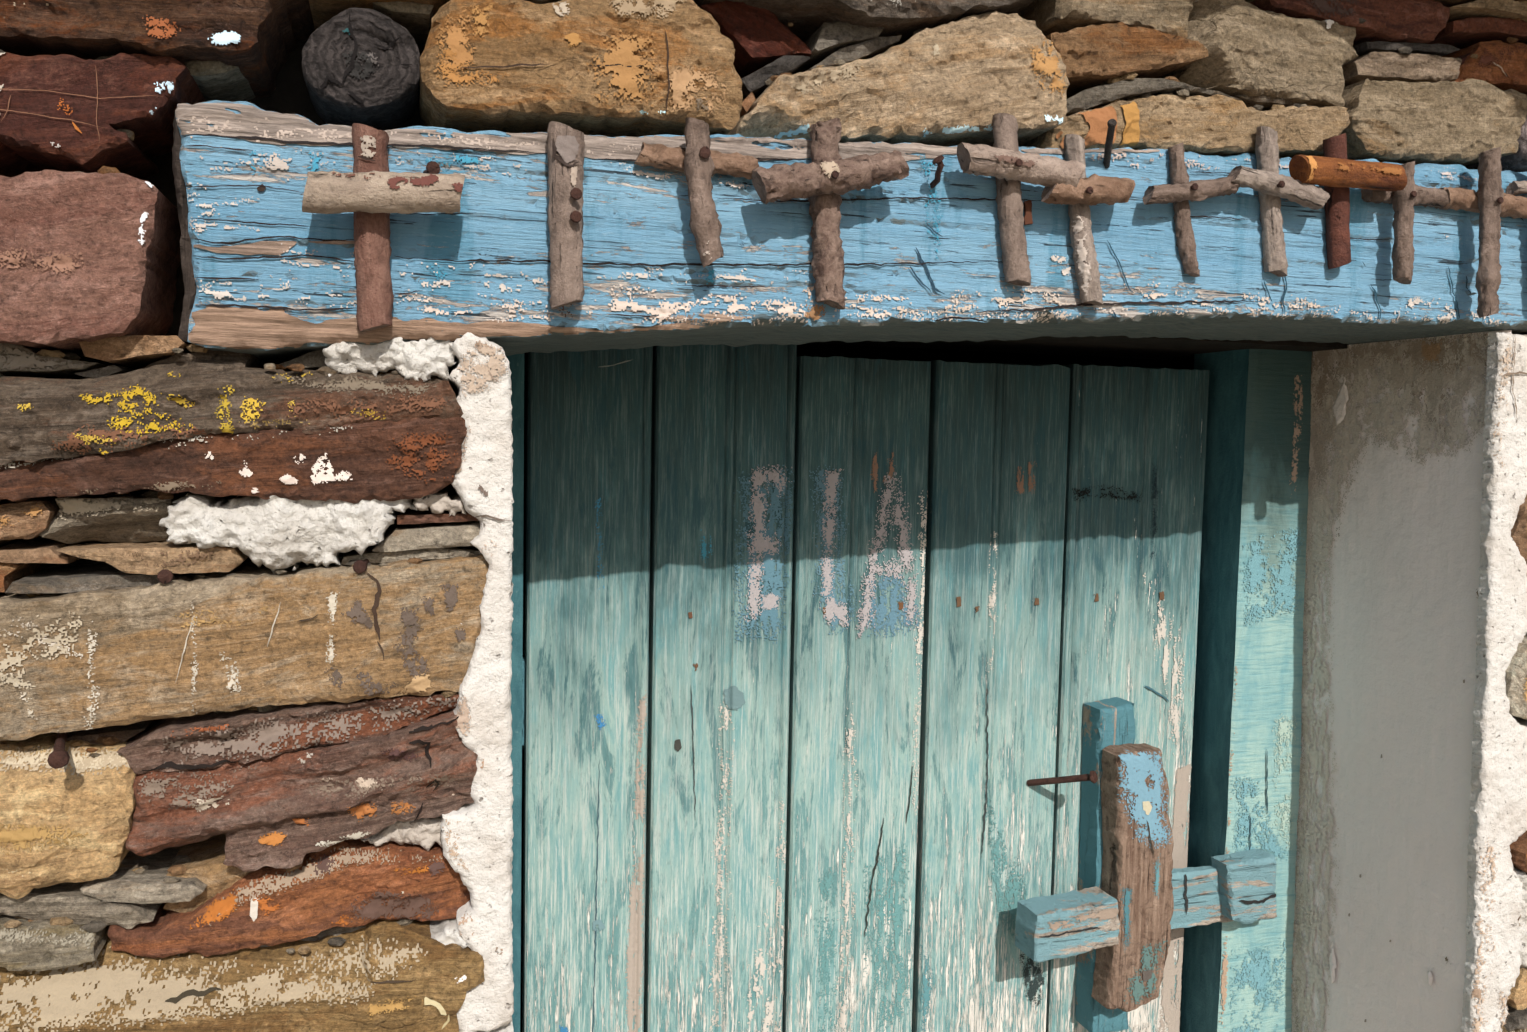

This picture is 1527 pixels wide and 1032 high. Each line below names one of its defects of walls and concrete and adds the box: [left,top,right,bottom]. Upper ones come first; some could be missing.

spalling [664,65,728,116]
spalling [1095,72,1189,109]
corrosion [1078,102,1140,149]
peeling [710,137,957,178]
peeling [994,148,1064,168]
peeling [1084,148,1164,169]
peeling [1306,155,1318,182]
peeling [172,103,817,376]
peeling [833,214,1506,326]
spalling [1289,375,1303,495]
spalling [103,490,174,500]
spalling [1219,936,1229,1028]